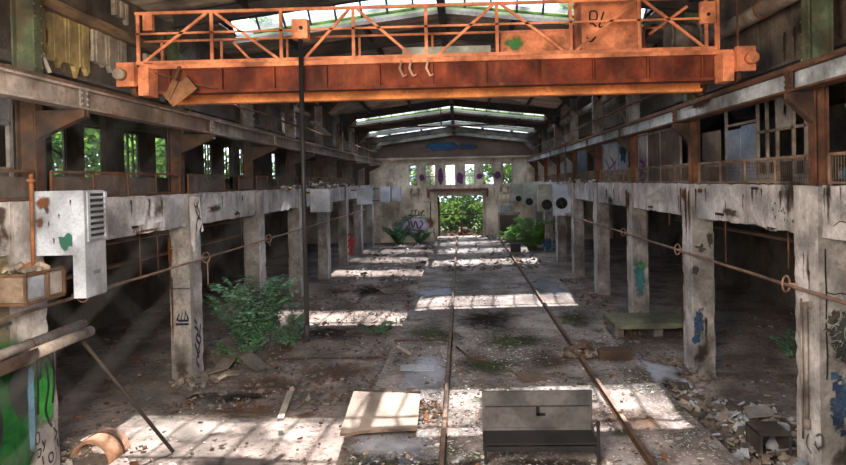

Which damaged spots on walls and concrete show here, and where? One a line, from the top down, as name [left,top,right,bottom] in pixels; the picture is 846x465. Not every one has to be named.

leakage [715,187,762,217]
leakage [772,177,800,223]
leakage [0,207,11,246]